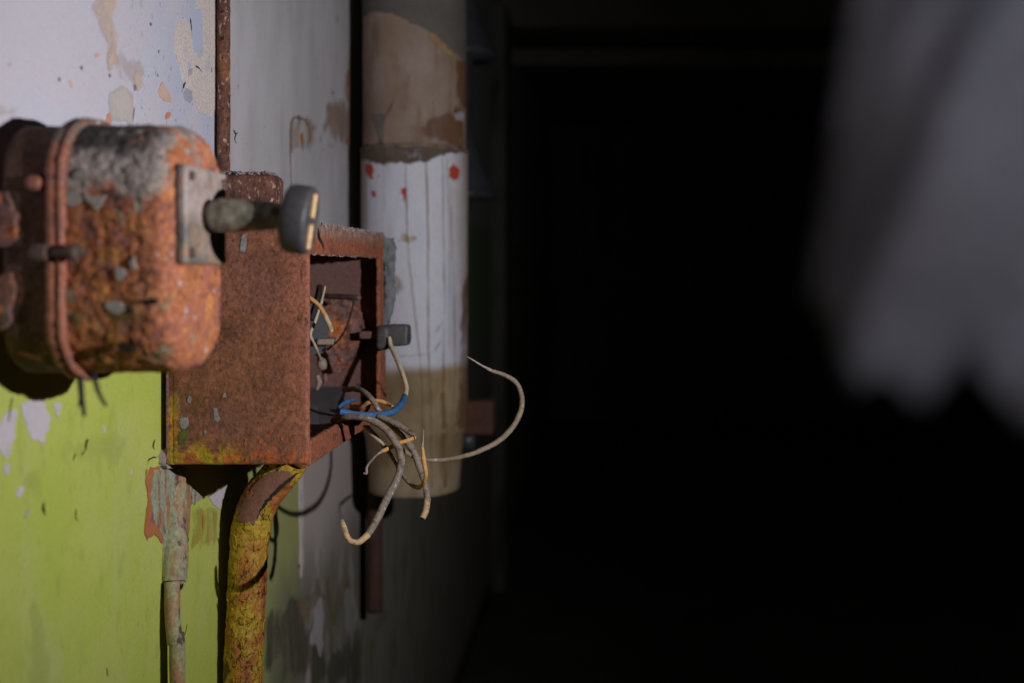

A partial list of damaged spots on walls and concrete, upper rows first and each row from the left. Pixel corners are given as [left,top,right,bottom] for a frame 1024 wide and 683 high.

peeling [157,0,217,119]
peeling [362,0,466,61]
peeling [0,398,61,476]
peeling [150,469,228,571]